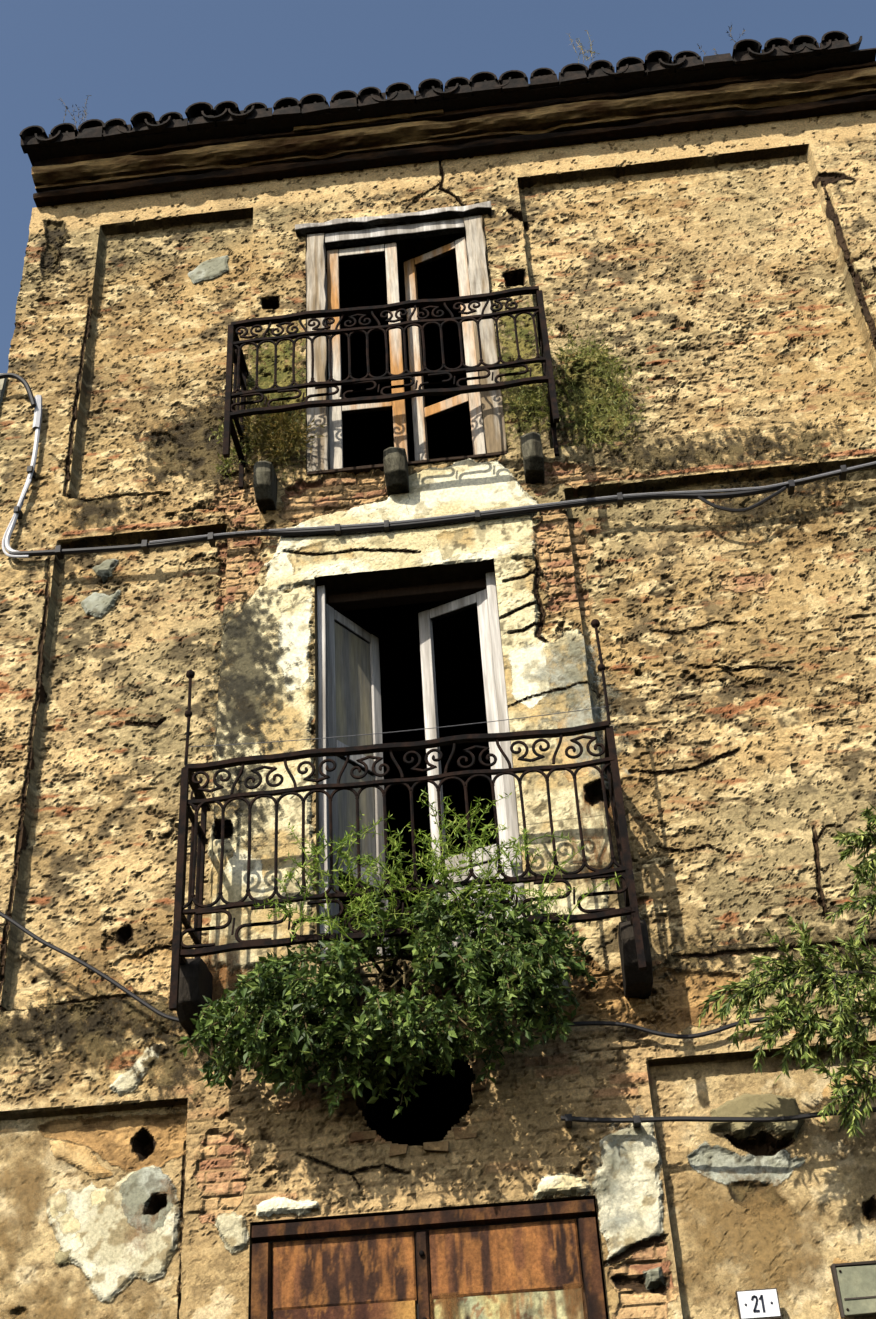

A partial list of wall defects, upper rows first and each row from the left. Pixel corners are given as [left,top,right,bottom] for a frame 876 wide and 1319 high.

crack [406,161,464,209]
crack [287,547,417,556]
crack [502,554,547,642]
water stain [193,586,312,869]
flaking render [207,458,660,974]
spalling [109,1043,162,1096]
flaking render [37,1110,318,1302]
flaking render [533,1116,679,1319]
spalling [687,1130,805,1207]
corrosion [564,1283,588,1319]